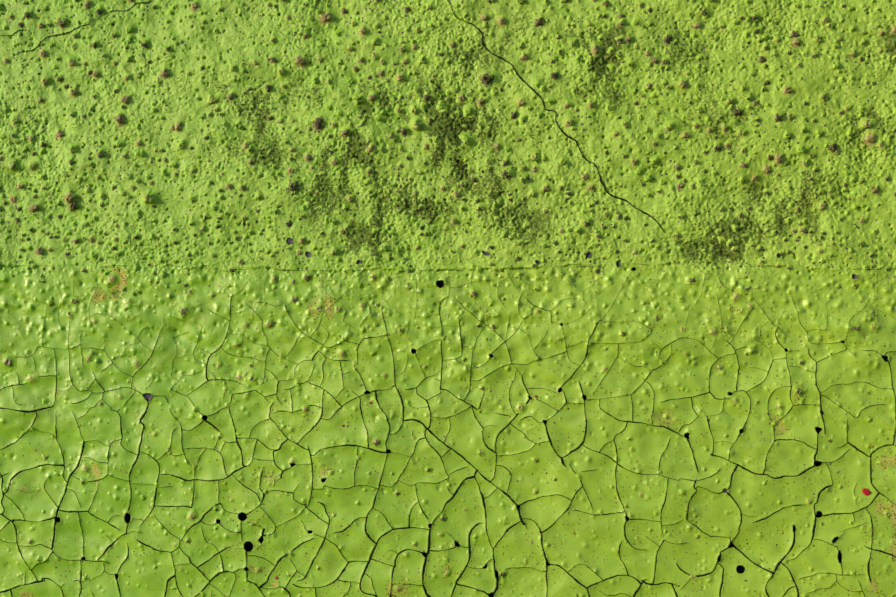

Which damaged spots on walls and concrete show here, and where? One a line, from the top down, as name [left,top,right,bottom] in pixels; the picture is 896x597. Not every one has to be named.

crack [447,0,665,233]
crack [0,264,896,597]